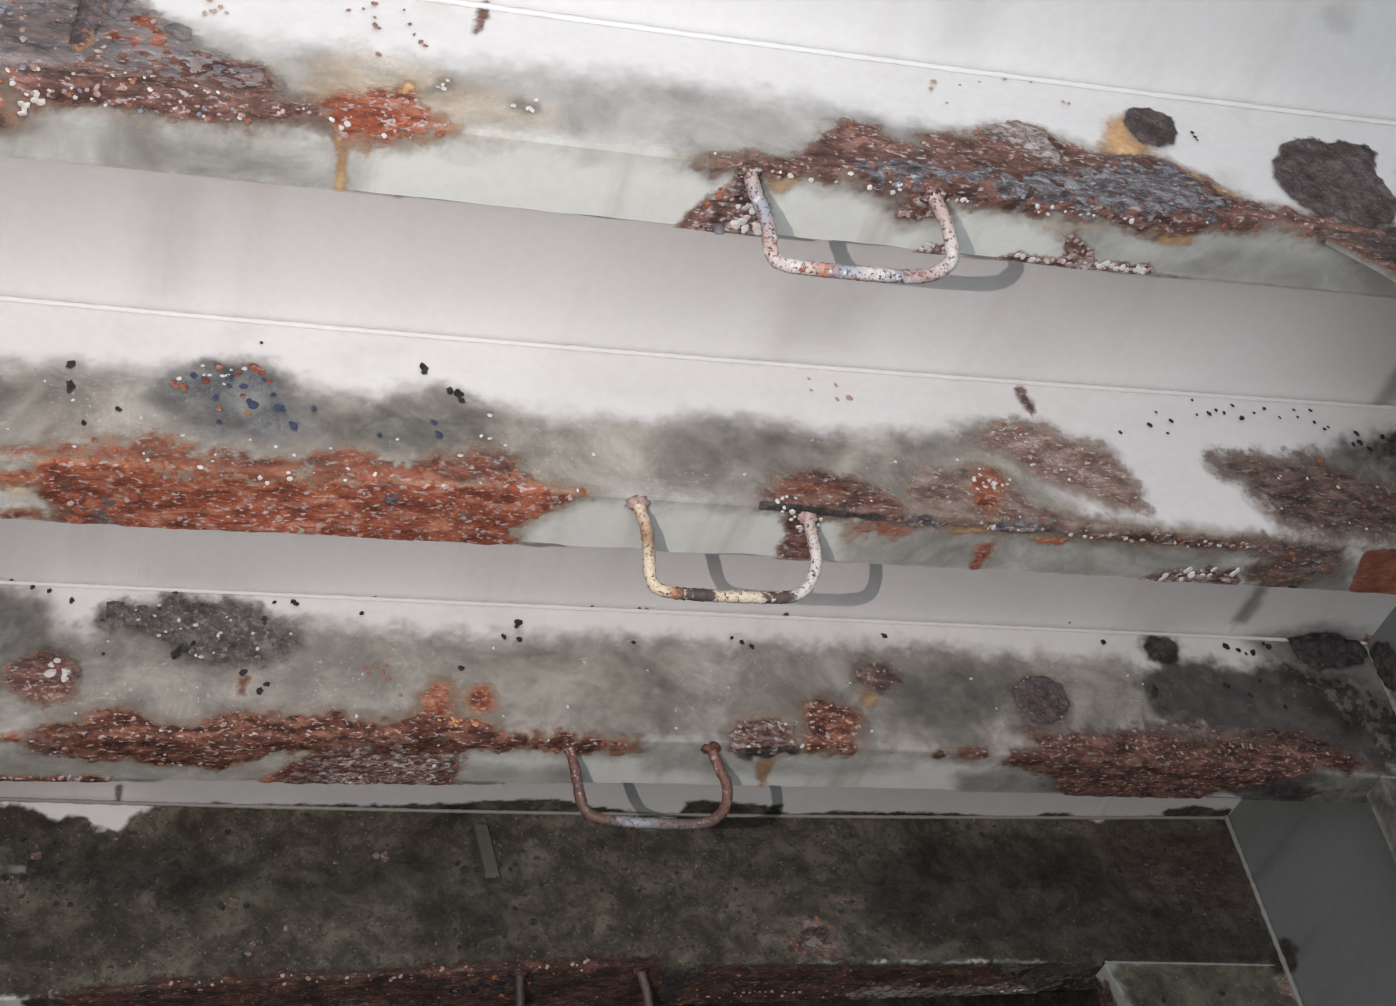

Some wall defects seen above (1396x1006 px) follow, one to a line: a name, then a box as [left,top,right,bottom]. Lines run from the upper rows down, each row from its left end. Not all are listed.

damp [0,121,349,191]
corrosion [0,0,533,192]
damp [212,48,345,97]
damp [435,79,840,153]
corrosion [693,117,1396,278]
corrosion [0,430,586,545]
damp [0,362,1241,579]
corrosion [759,387,1396,595]
corrosion [0,648,643,786]
damp [0,593,1396,853]
corrosion [932,718,1381,802]
damp [0,799,1298,1006]